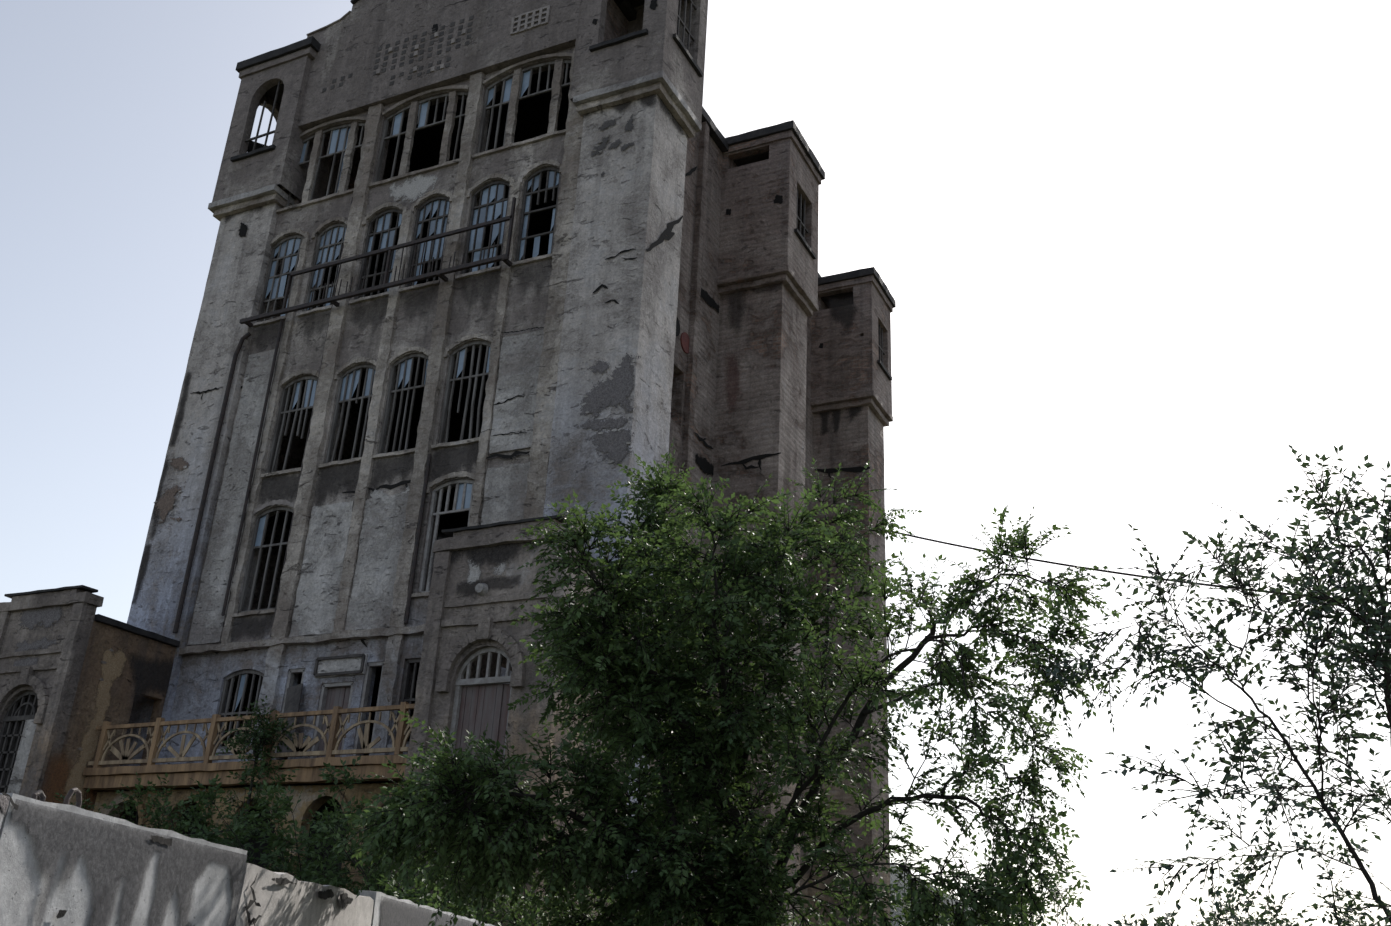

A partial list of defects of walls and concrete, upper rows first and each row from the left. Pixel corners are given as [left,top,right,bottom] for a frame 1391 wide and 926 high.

peeling [591,114,634,157]
crack [592,215,683,304]
spalling [576,353,641,465]
peeling [64,645,127,805]
leakage [0,790,279,926]
crack [244,873,261,926]